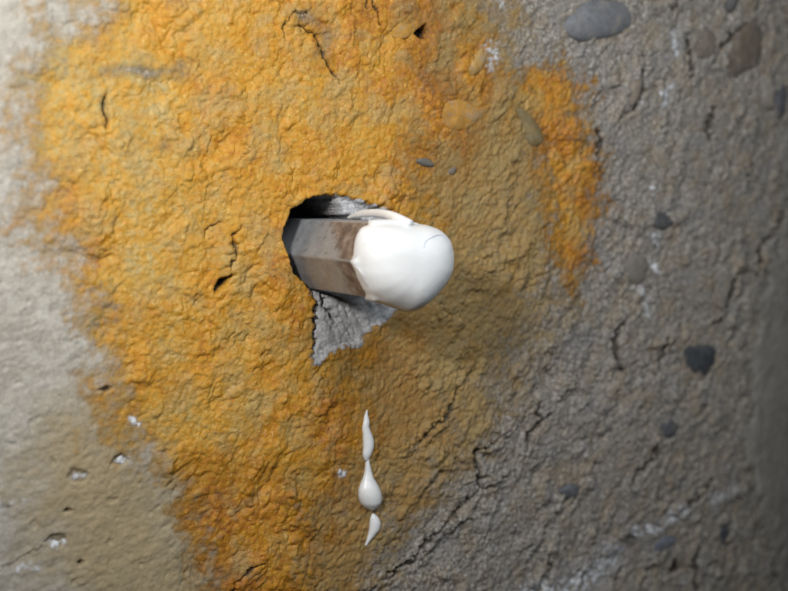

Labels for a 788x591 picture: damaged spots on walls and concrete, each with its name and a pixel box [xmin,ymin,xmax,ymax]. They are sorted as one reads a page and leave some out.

spalling [106,63,183,79]
crack [282,11,334,76]
spalling [327,193,387,220]
corrosion [18,0,611,591]
spalling [308,288,397,366]
spalling [354,0,788,591]
leakage [362,410,374,461]